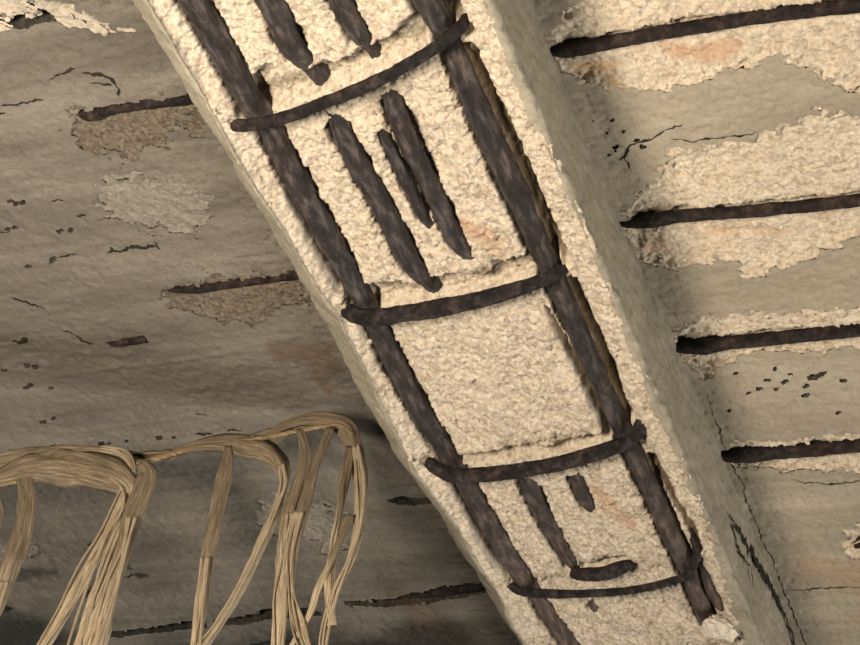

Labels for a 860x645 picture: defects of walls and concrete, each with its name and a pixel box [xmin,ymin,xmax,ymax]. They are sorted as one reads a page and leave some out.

peeling [0,0,136,36]
spalling [545,0,860,93]
crack [615,124,756,171]
spalling [620,106,860,279]
spalling [59,0,745,645]
spalling [671,305,860,381]
spalling [746,367,793,395]
spalling [801,371,827,398]
spalling [721,432,860,474]
crack [707,400,860,645]
spalling [840,521,860,559]